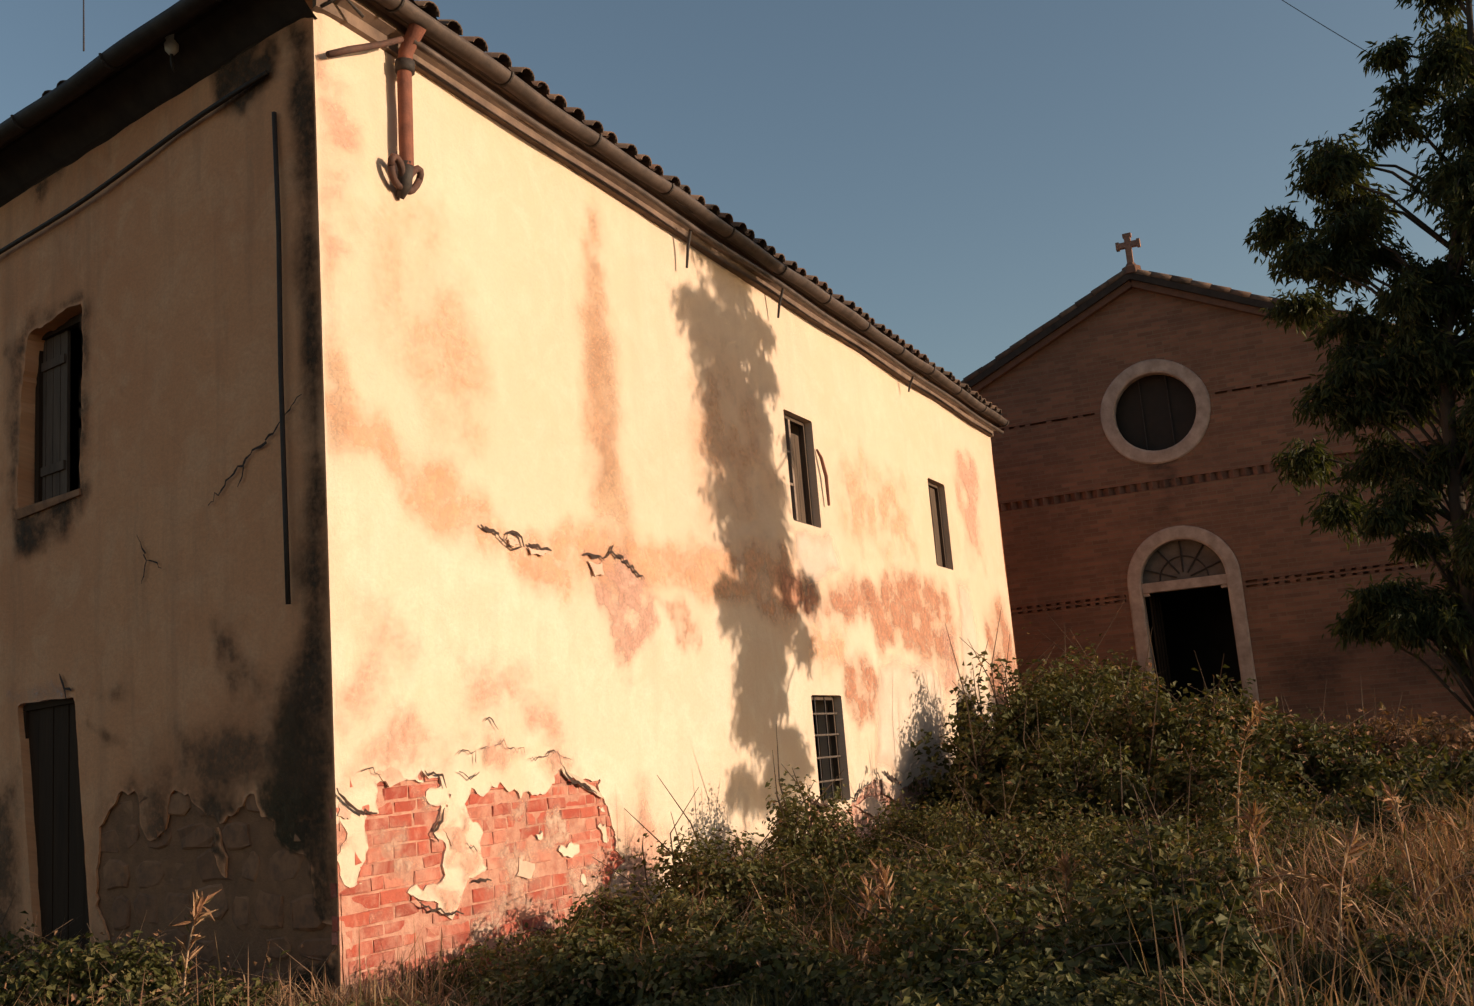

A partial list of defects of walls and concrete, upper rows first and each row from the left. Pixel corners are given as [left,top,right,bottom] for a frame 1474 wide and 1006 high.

damp [214,26,355,442]
damp [13,483,87,556]
crack [208,394,302,506]
damp [583,263,657,661]
damp [182,451,336,920]
damp [782,573,957,689]
damp [986,604,1018,711]
flaking render [98,717,625,1006]
flaking render [806,770,931,858]
damp [287,958,337,1003]